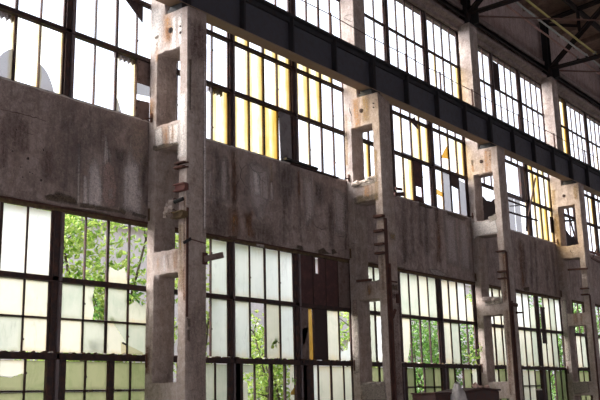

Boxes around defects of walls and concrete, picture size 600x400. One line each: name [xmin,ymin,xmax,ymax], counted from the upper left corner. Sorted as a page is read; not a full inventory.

water stain [63,124,146,214]